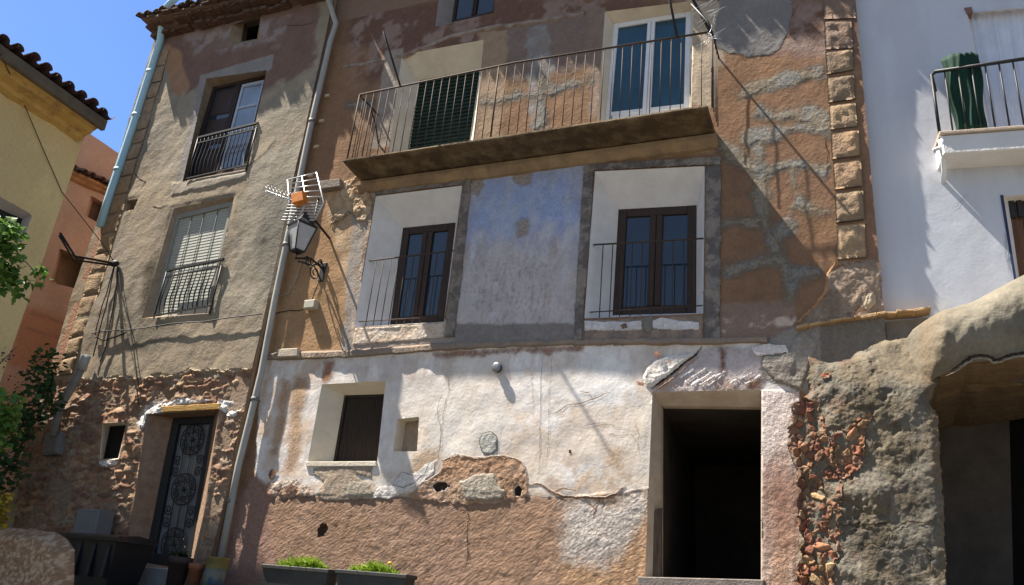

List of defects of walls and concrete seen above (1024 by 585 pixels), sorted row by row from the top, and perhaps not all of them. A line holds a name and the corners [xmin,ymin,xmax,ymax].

spalling [330,176,374,281]
flaking render [139,398,247,428]
flaking render [371,391,528,505]
crack [528,360,639,517]
spalling [787,371,873,585]
crack [946,351,1024,376]